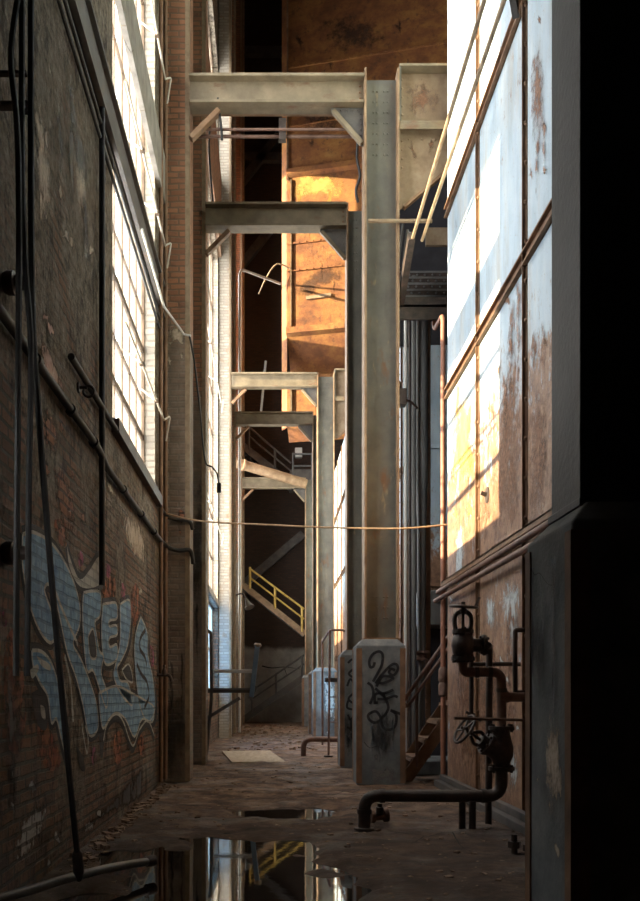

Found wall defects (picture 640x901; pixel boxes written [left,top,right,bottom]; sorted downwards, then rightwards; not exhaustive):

corrosion [530,55,546,178]
corrosion [505,284,520,353]
corrosion [531,328,547,368]
corrosion [452,386,472,476]
corrosion [467,363,520,537]